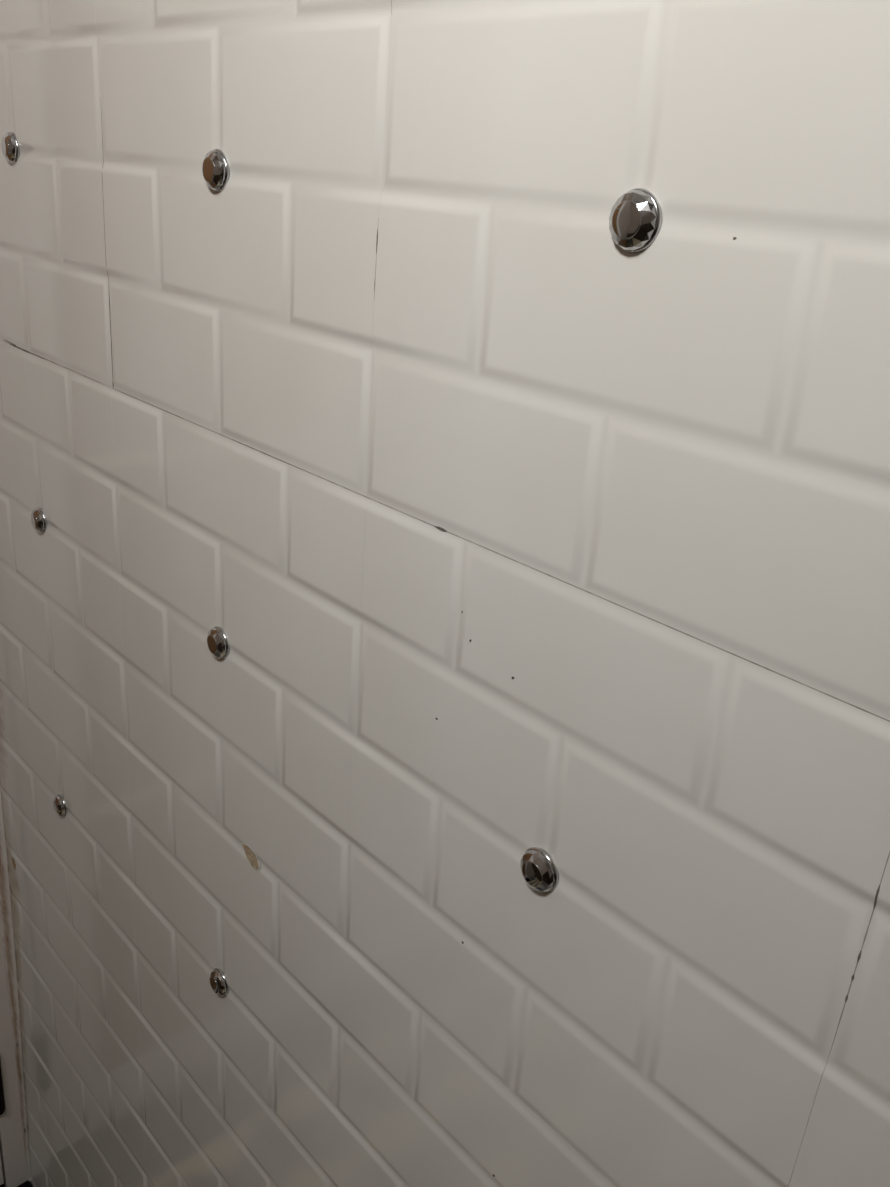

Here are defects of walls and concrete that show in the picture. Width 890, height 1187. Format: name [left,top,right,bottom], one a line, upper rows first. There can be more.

crack [4,113,890,722]
crack [829,852,890,1055]